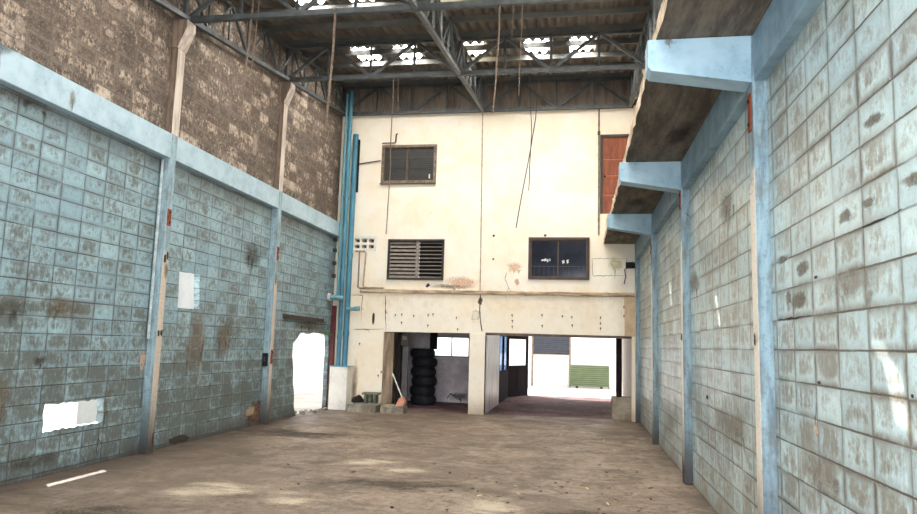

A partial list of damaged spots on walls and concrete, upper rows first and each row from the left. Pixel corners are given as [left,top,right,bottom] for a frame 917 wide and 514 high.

damp [47,299,73,316]